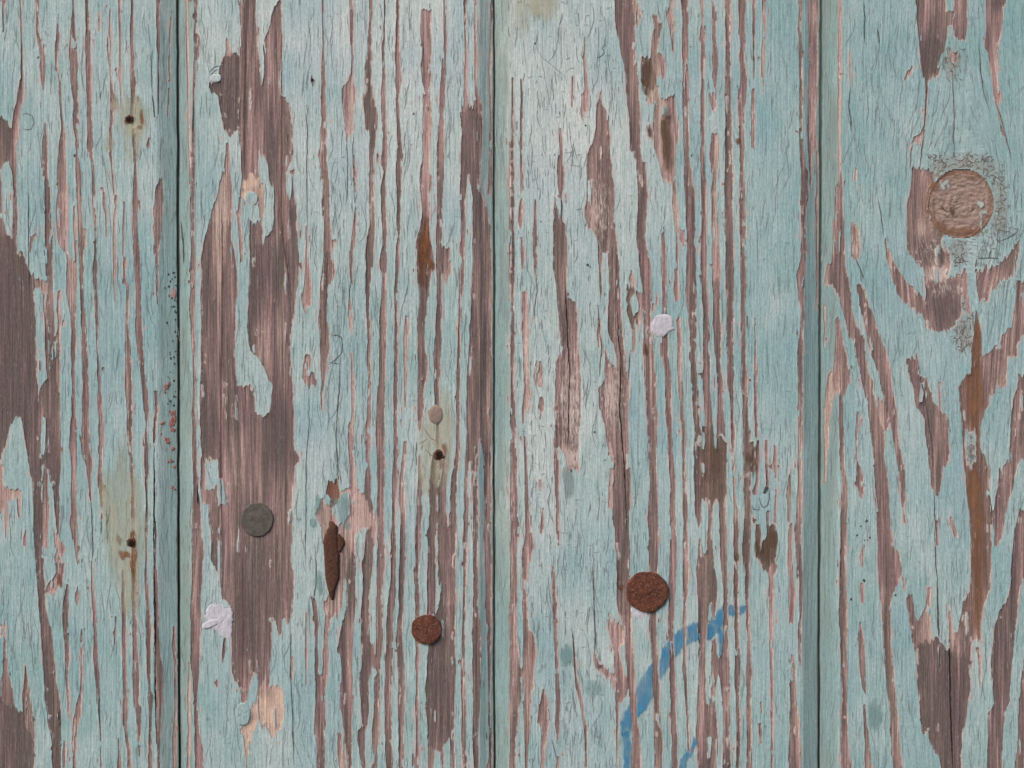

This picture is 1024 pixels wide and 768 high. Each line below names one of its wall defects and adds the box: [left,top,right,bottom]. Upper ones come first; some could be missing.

corrosion [102,490,138,607]
corrosion [122,100,144,136]
peeling [0,0,493,768]
peeling [571,0,1024,768]